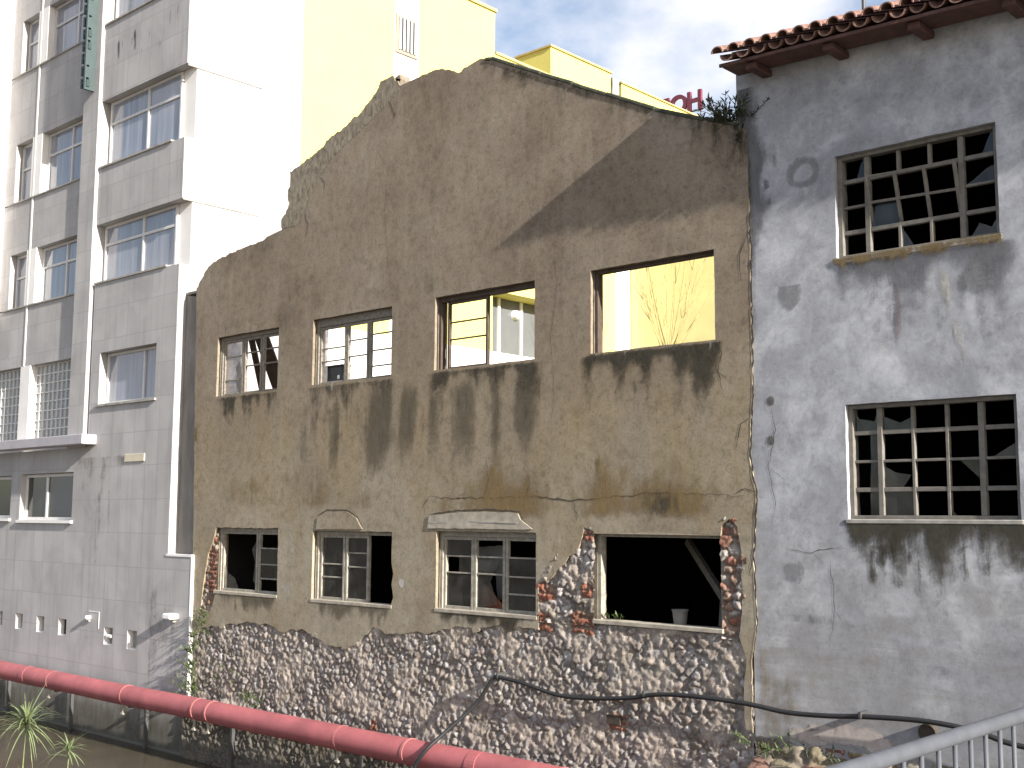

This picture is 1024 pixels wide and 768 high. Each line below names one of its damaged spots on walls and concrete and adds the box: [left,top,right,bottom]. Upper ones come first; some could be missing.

water stain [221,392,276,415]
water stain [312,383,358,457]
water stain [367,379,417,465]
water stain [430,362,540,443]
water stain [583,341,720,394]
crack [519,143,784,718]
crack [423,462,489,511]
water stain [844,520,1024,585]
crack [790,548,848,645]
flaking render [181,517,756,768]